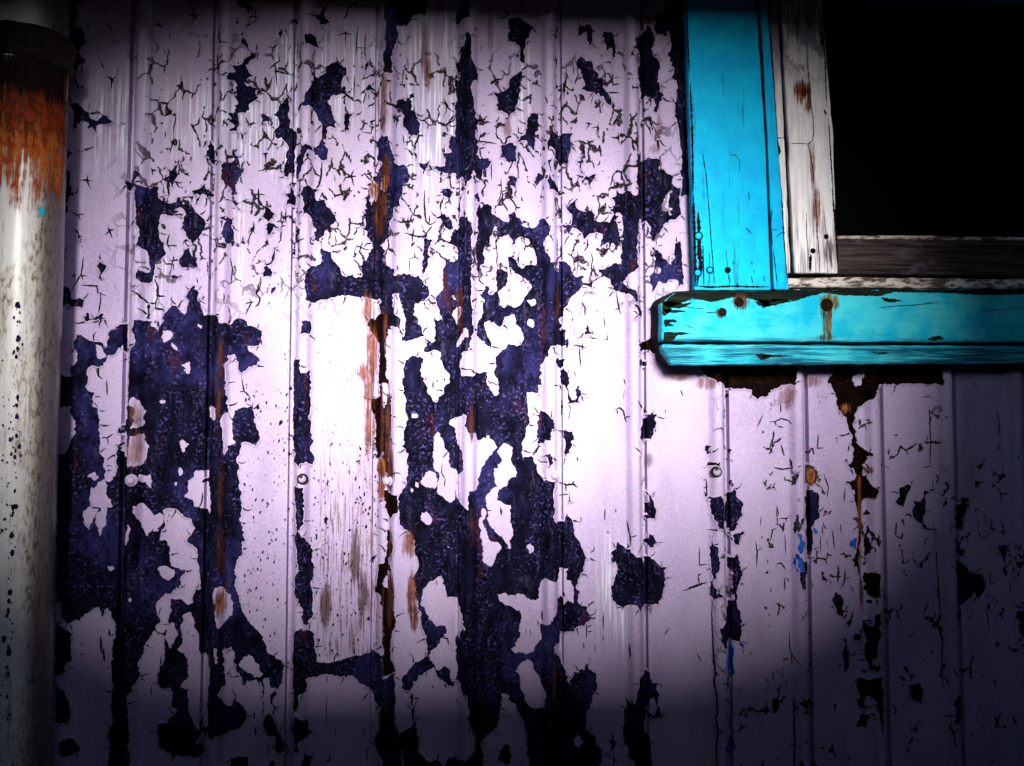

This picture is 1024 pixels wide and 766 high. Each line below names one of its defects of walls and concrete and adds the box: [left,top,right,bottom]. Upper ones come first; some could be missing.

rust [0,53,68,209]
crack [131,234,177,312]
crack [197,188,299,318]
crack [394,189,444,268]
peeling [52,0,689,766]
rust [357,293,395,499]
peeling [695,365,802,402]
rust [351,533,368,622]
rust [407,574,418,631]
peeling [704,485,748,704]
crack [755,403,853,593]
peeling [791,365,971,737]